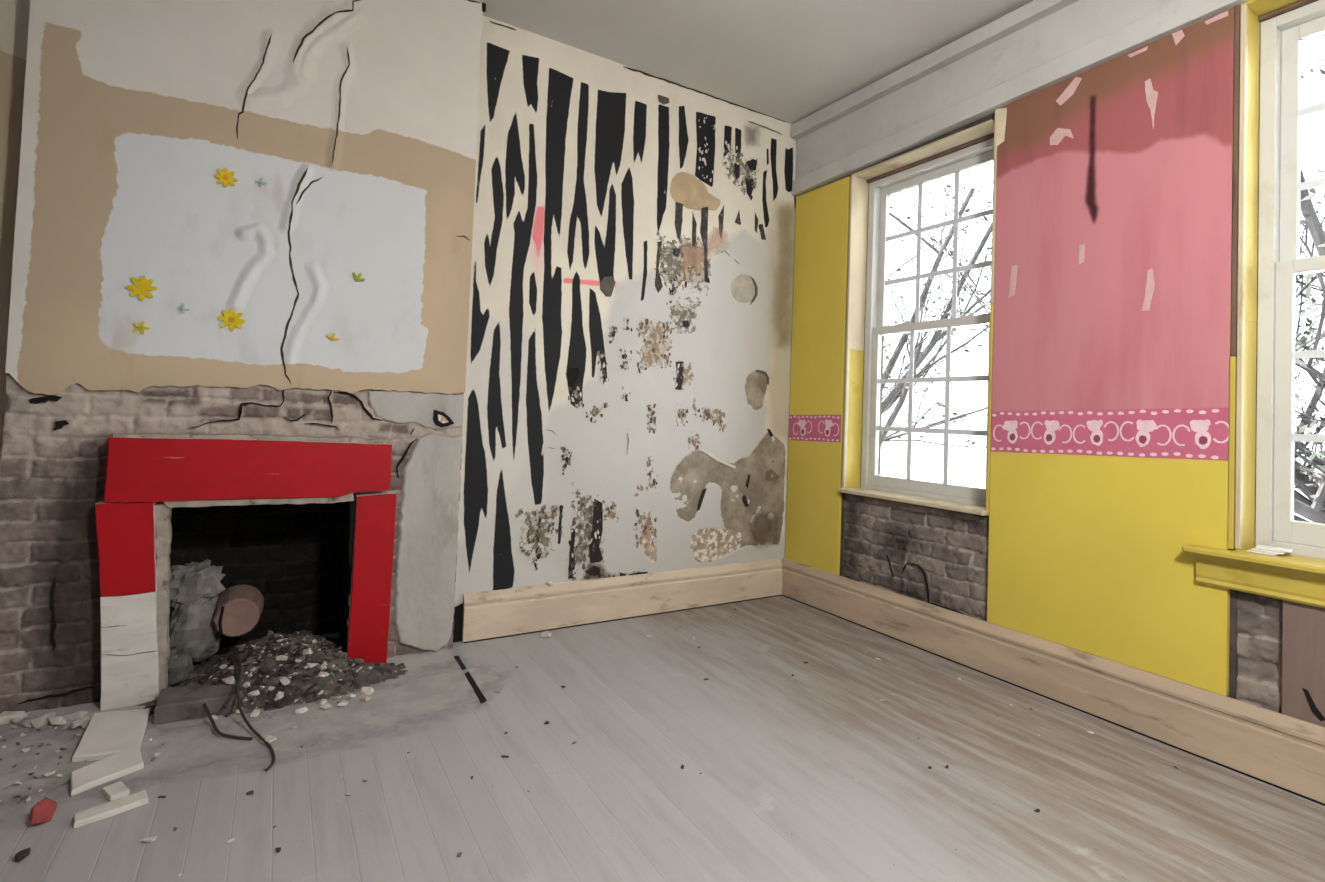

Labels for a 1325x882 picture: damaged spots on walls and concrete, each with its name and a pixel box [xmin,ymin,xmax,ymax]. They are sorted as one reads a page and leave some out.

crack [236,0,361,140]
crack [467,0,516,30]
crack [623,66,786,135]
crack [188,47,416,478]
spalling [515,117,786,581]
flaking render [0,373,464,714]
flaking render [842,494,989,621]
flaking render [1236,591,1282,713]